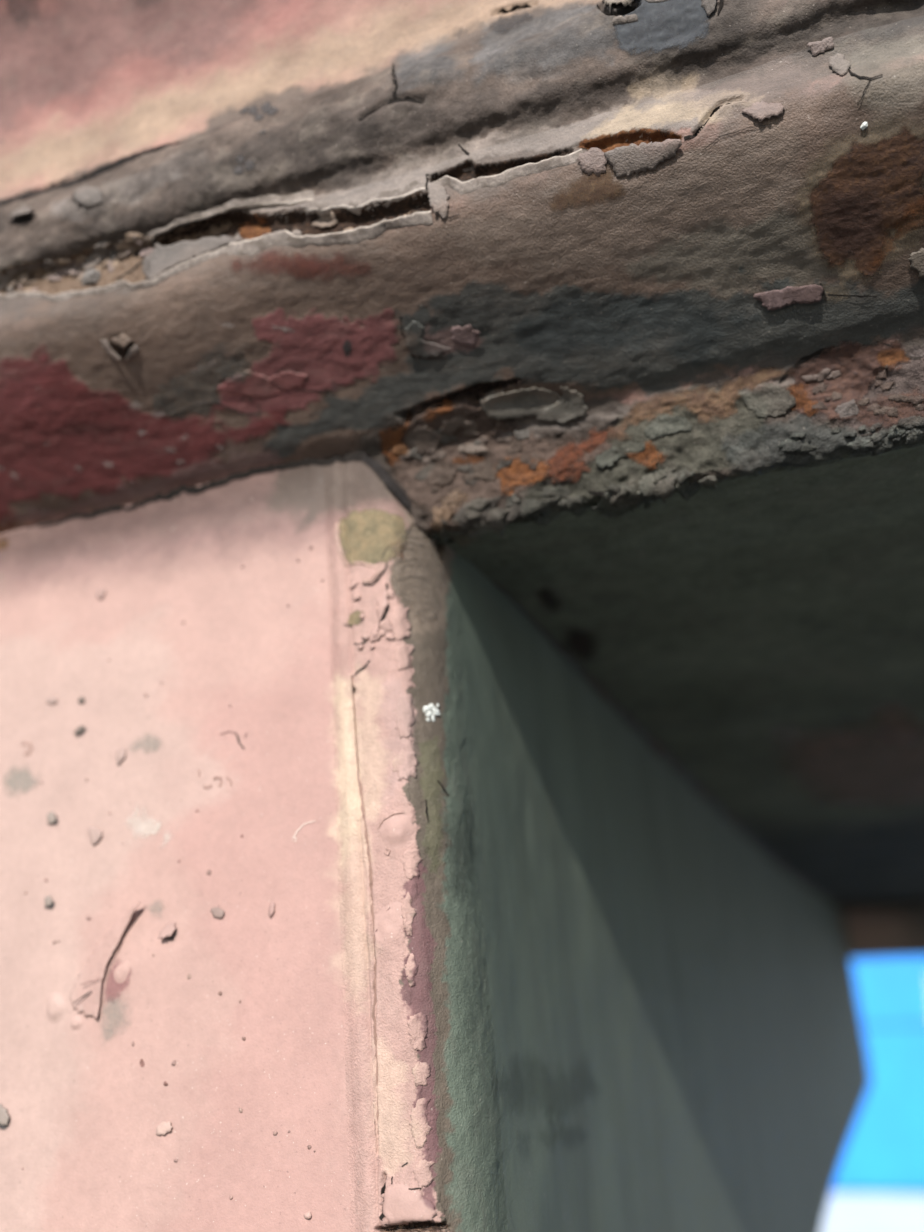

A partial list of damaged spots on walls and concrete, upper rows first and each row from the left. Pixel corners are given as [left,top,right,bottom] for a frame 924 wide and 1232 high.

peeling [597,0,723,54]
peeling [312,211,338,229]
peeling [427,182,450,219]
peeling [577,139,682,177]
peeling [702,101,785,151]
rust [797,120,924,278]
peeling [100,334,139,361]
rust [379,341,924,534]
peeling [392,693,419,781]
peeling [401,848,422,936]
peeling [70,901,147,1031]
spalling [379,1012,450,1232]